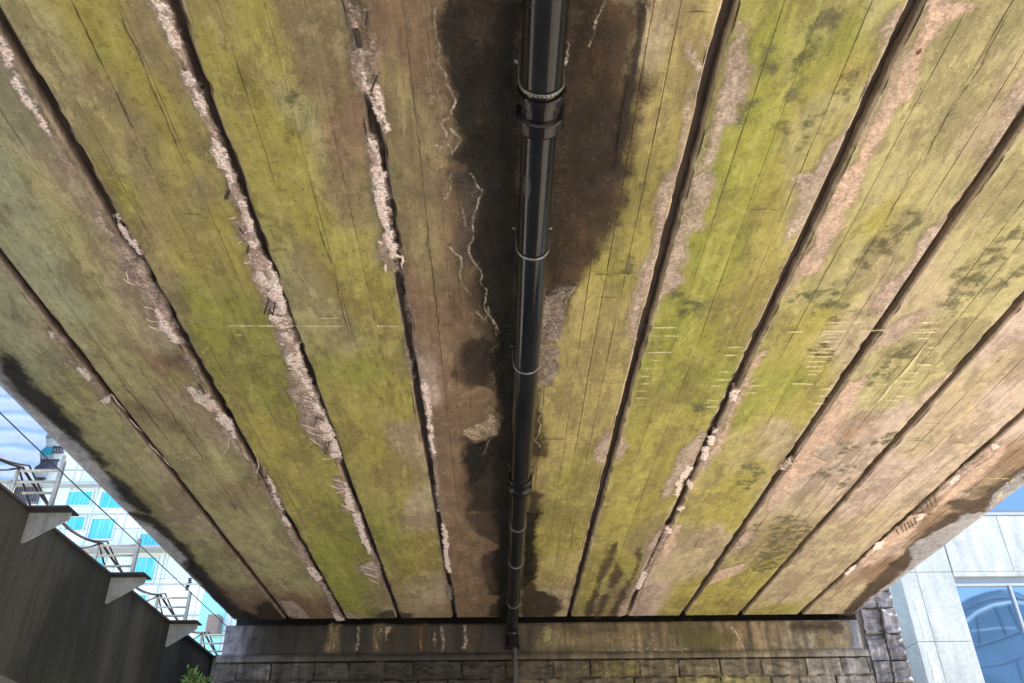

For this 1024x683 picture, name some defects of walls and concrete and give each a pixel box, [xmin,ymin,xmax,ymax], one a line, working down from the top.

spalling [69,360,143,432]
water stain [0,355,291,622]
spalling [92,205,362,621]
spalling [147,0,342,462]
spalling [346,0,405,277]
spalling [406,349,440,511]
crack [425,218,439,333]
spalling [441,523,452,600]
water stain [424,0,687,652]
peeling [618,351,767,617]
peeling [845,439,1007,575]